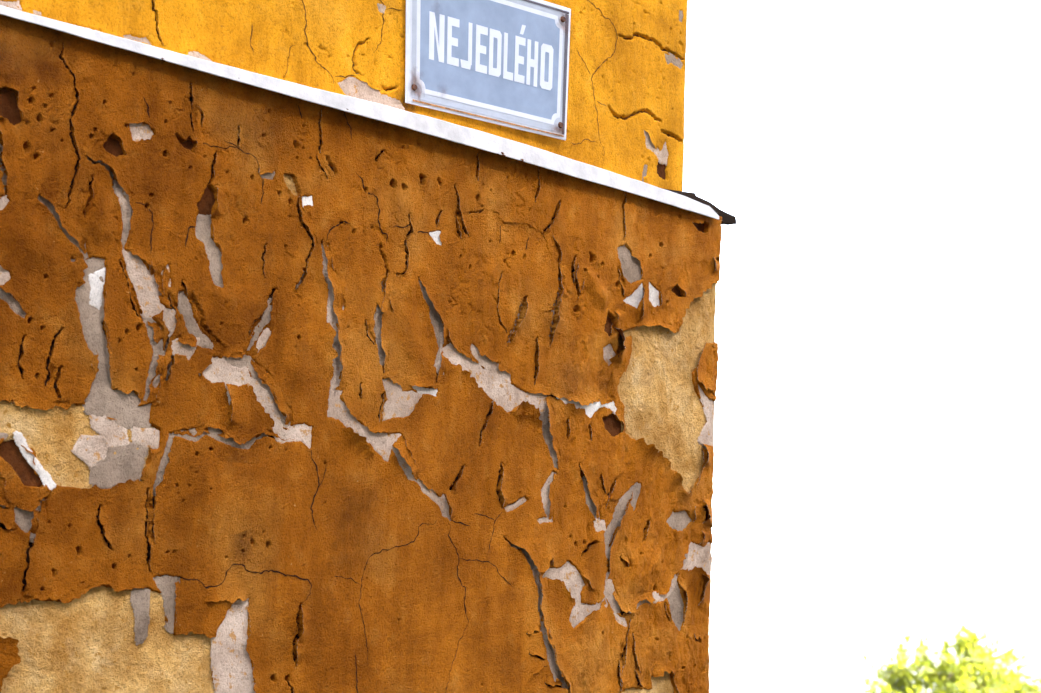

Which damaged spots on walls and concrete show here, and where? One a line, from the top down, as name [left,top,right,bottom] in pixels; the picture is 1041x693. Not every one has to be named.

crack [283,0,401,84]
crack [572,0,683,156]
crack [0,118,20,196]
spalling [103,113,156,157]
spalling [258,163,314,213]
peeling [642,127,668,182]
crack [18,328,66,400]
peeling [0,182,312,542]
crack [40,41,687,693]
peeling [321,243,720,693]
crack [0,489,51,595]
peeling [0,575,263,693]